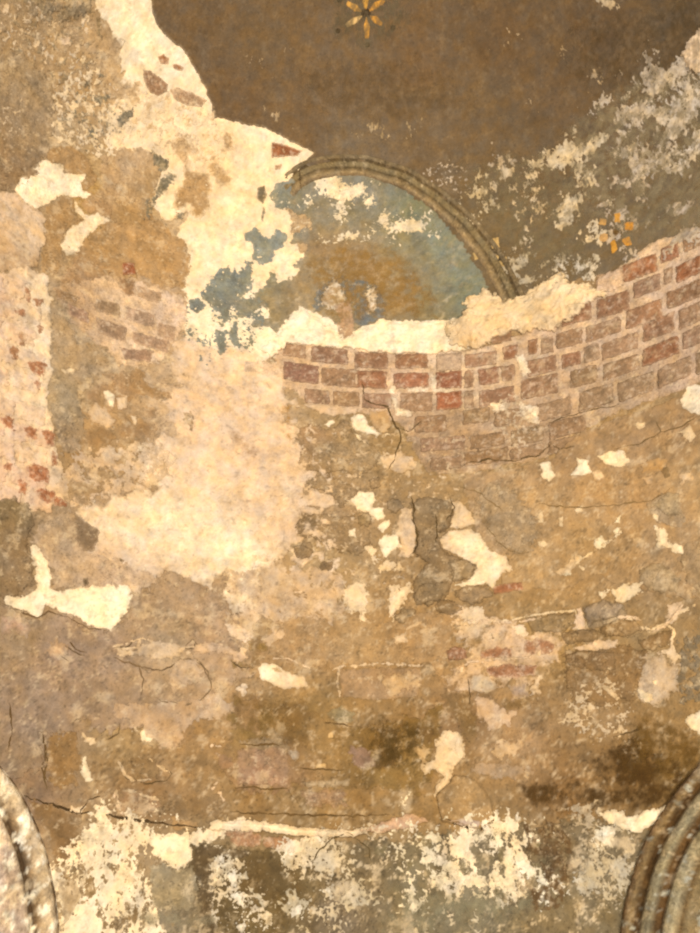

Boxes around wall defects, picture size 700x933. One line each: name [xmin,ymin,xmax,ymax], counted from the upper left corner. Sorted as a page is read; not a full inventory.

flaking render [0,0,700,694]
crack [362,384,421,470]
crack [615,416,699,449]
crack [410,403,620,556]
crack [539,492,666,508]
crack [113,639,212,706]
crack [241,740,279,748]
crack [232,786,390,862]
peeling [50,756,666,933]
leakage [523,786,557,804]
leakage [588,720,698,808]